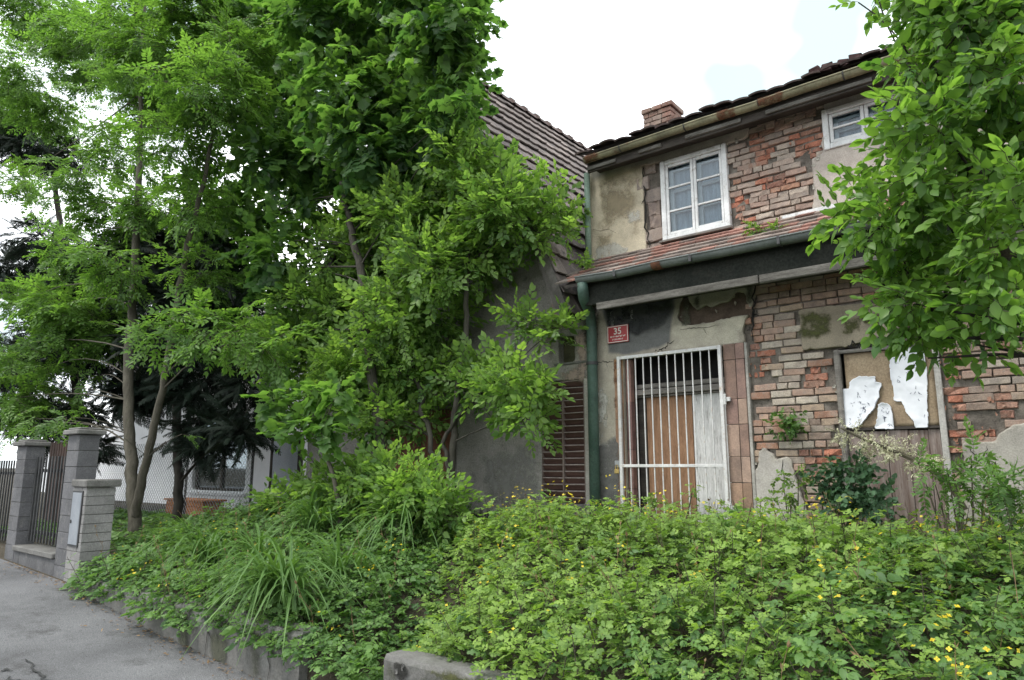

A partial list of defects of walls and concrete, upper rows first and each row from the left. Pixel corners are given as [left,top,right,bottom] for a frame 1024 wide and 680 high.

flaking render [727,105,824,229]
flaking render [678,267,882,526]
flaking render [933,322,1024,458]